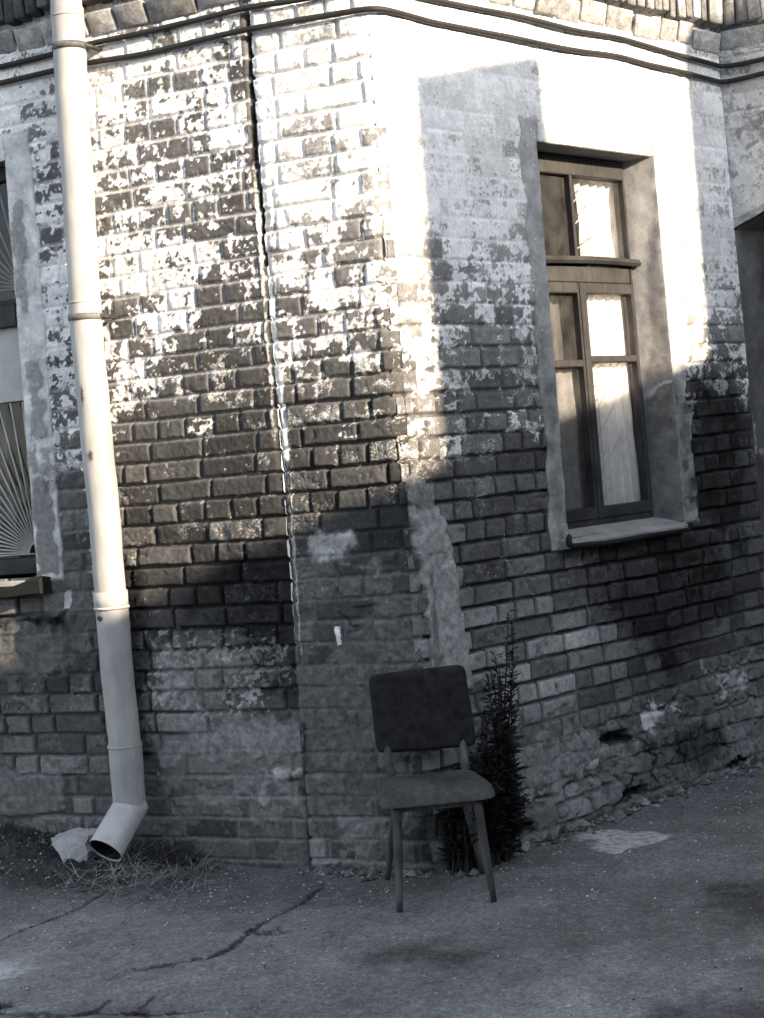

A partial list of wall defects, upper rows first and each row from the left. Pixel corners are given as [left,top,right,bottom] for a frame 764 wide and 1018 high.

peeling [85,0,764,508]
crack [2,889,110,940]
crack [133,888,321,971]
crack [0,996,190,1018]